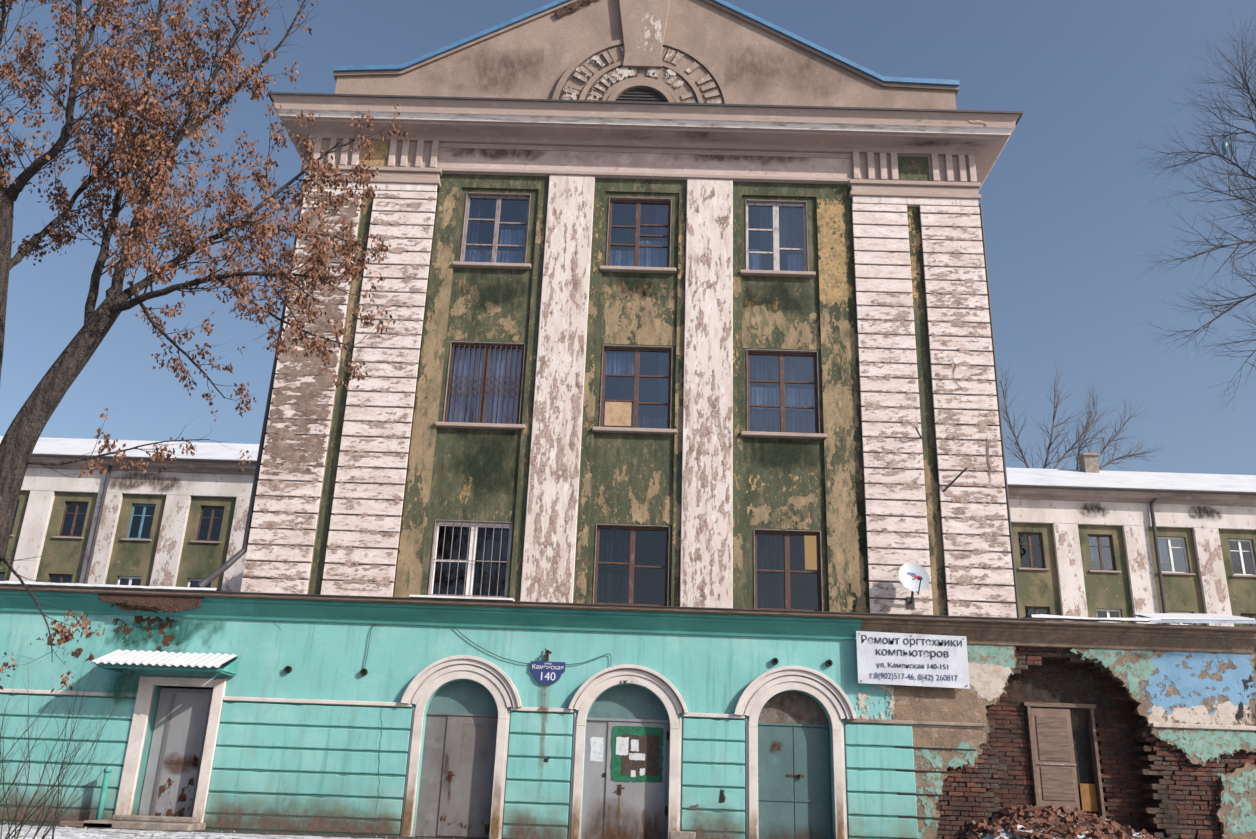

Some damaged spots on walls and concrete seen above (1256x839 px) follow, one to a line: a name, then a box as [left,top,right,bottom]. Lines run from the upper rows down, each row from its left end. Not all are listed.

peeling [627,12,662,51]
peeling [563,52,684,100]
leakage [473,281,523,309]
leakage [744,283,801,310]
peeling [514,182,1012,617]
leakage [115,620,216,652]
leakage [109,671,138,702]
flaking render [908,644,1256,839]
rust [155,758,198,817]